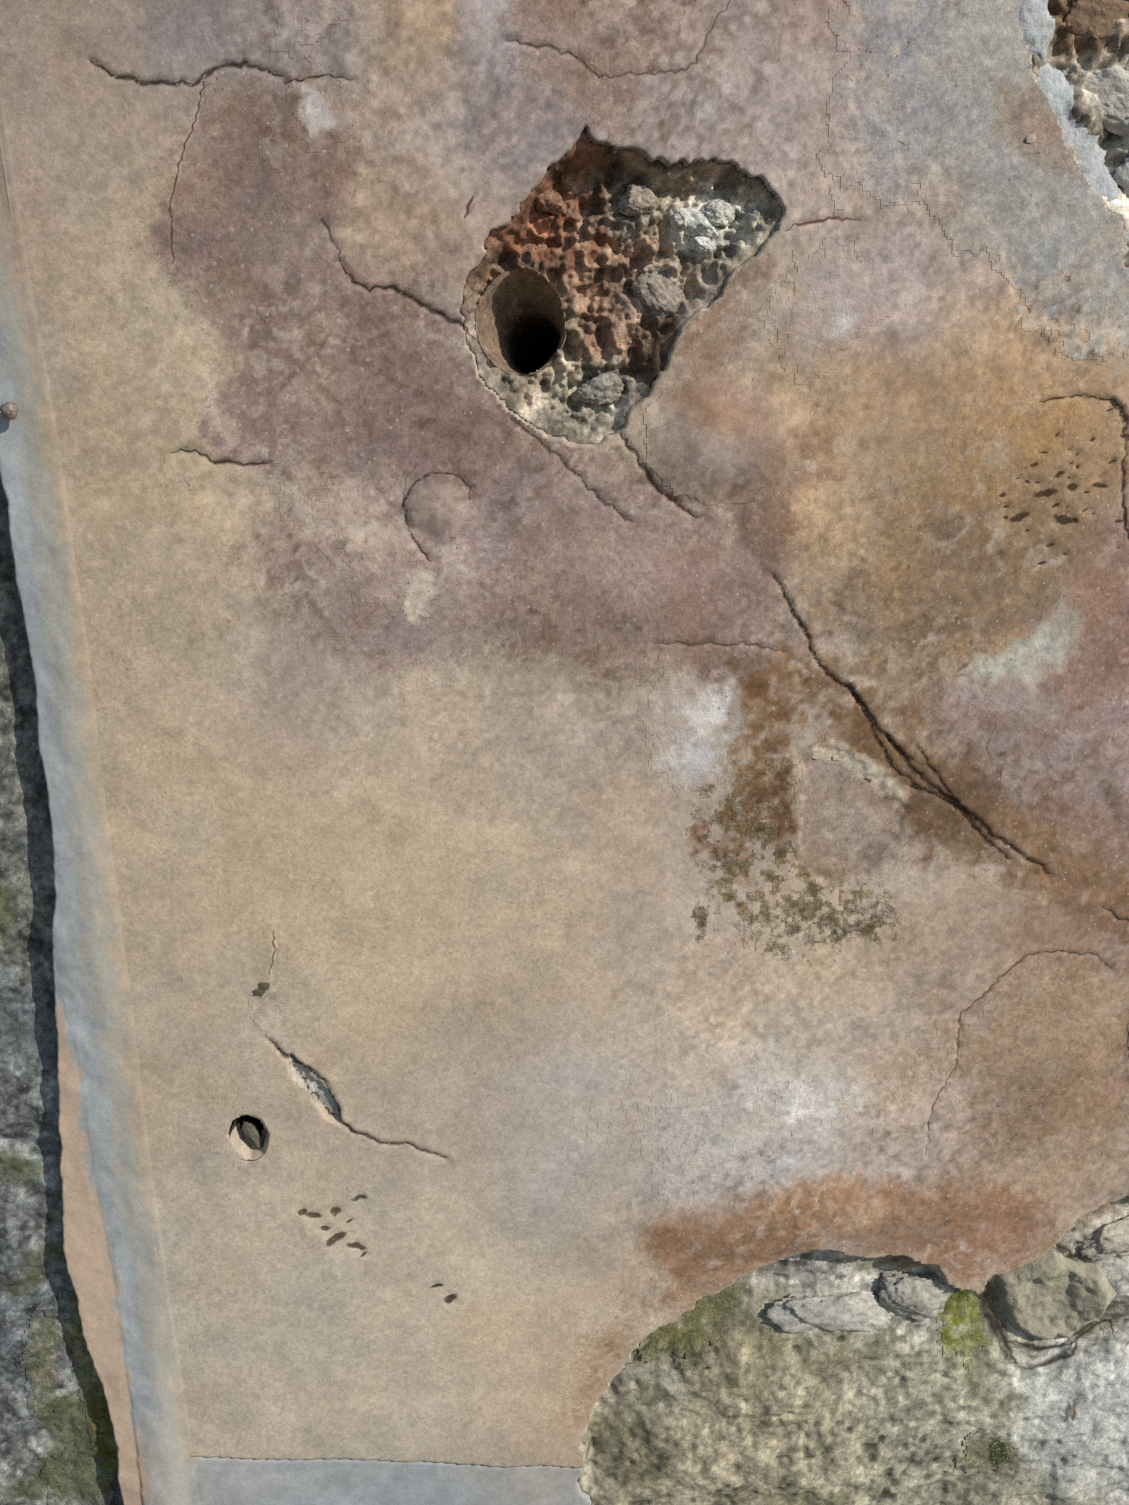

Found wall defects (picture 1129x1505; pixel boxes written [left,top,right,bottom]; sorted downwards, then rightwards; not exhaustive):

crack [90,59,347,264]
crack [321,217,480,345]
spalling [460,128,782,444]
peeling [817,0,1129,365]
spalling [1016,432,1116,524]
crack [1043,394,1129,537]
crack [656,575,1051,874]
water stain [690,902,709,943]
water stain [739,888,909,946]
crack [270,1039,446,1158]
corrosion [546,939,1129,1441]
spalling [578,1196,1129,1505]